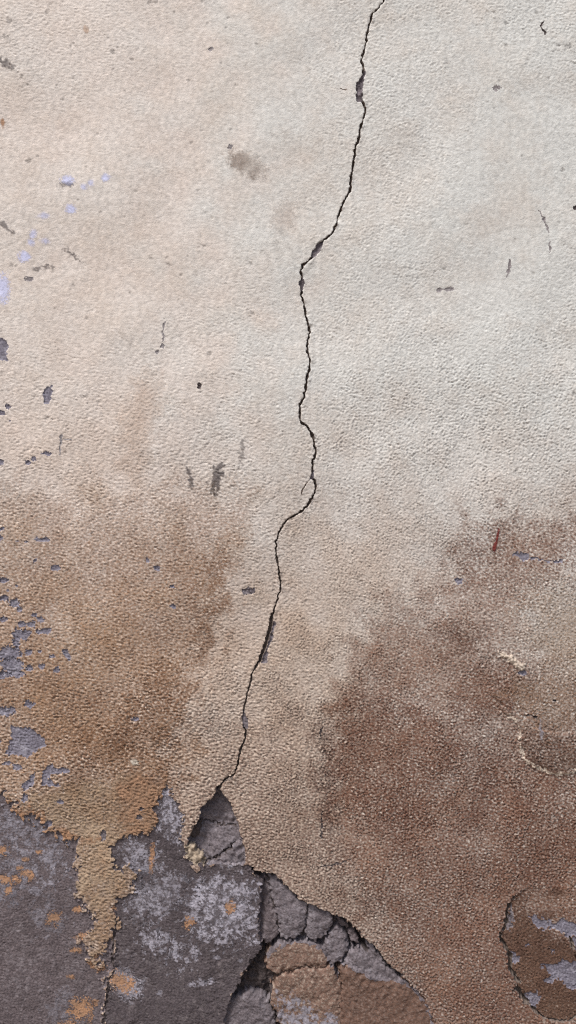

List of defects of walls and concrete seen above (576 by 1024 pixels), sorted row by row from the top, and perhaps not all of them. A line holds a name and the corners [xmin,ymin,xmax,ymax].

crack [218,0,385,790]
peeling [0,577,72,679]
damp [0,545,223,965]
peeling [0,699,436,1024]
damp [323,623,576,1024]
spalling [501,900,576,1020]